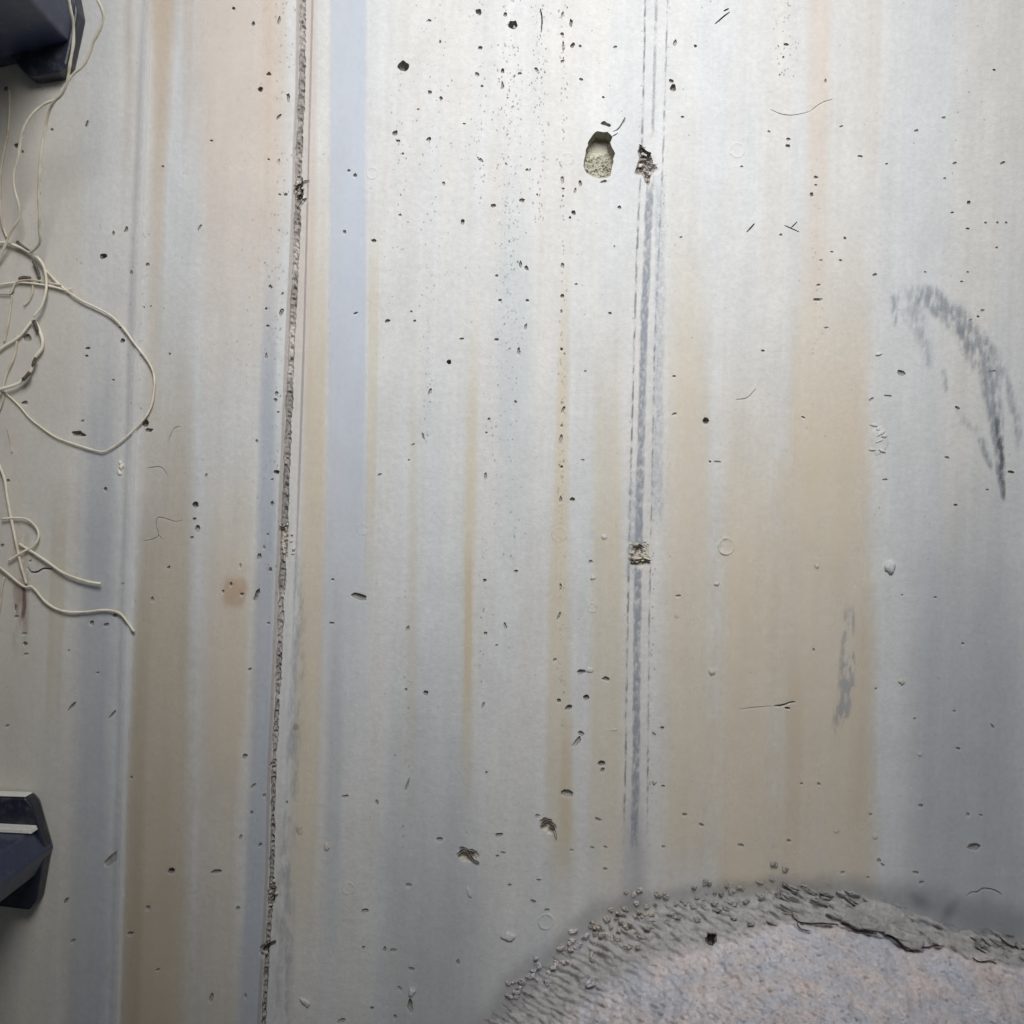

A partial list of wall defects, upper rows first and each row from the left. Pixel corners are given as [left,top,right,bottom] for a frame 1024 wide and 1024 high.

water stain [641,0,667,140]
spalling [560,118,625,193]
spalling [635,144,657,185]
water stain [629,179,661,548]
spalling [628,542,651,567]
water stain [624,563,651,828]